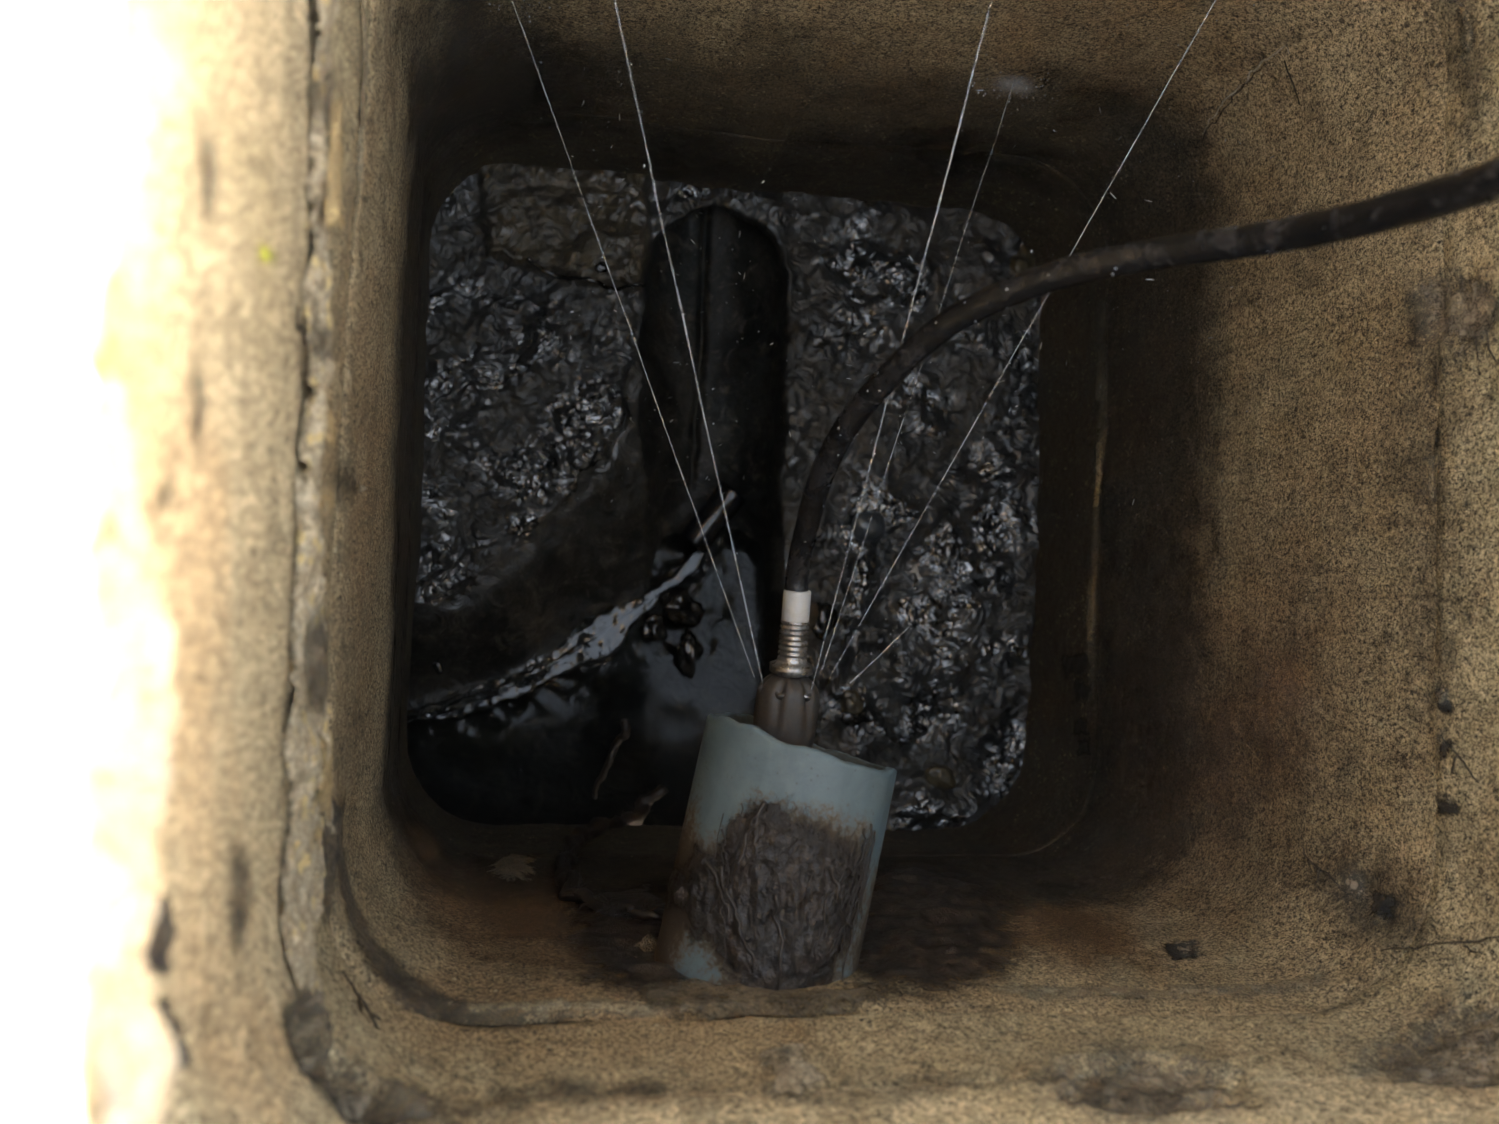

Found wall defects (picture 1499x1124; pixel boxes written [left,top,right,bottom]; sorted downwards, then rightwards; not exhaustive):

crack [1380,936,1499,959]